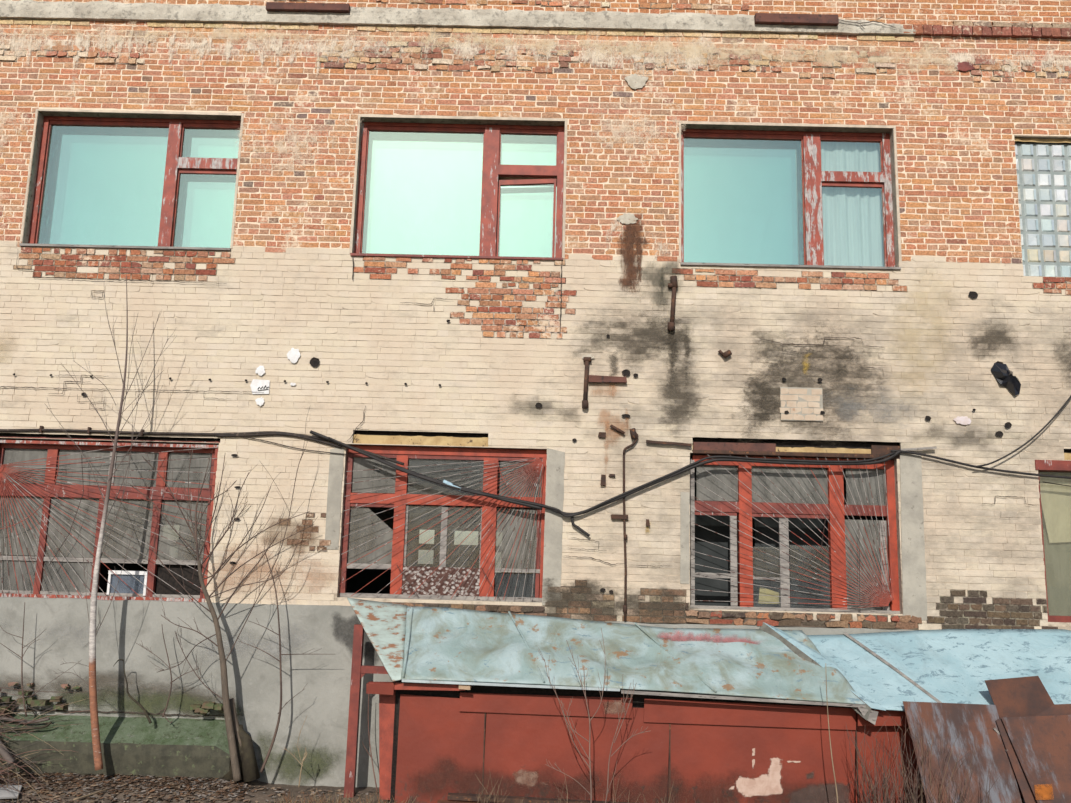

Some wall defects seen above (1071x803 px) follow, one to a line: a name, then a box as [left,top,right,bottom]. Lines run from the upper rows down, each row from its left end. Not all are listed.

peeling [13,247,235,282]
peeling [353,256,577,339]
leakage [643,243,677,304]
peeling [1033,277,1071,296]
leakage [669,334,690,372]
peeling [279,513,331,552]
spalling [386,580,1058,630]
leakage [55,675,222,712]
peeling [730,748,801,797]